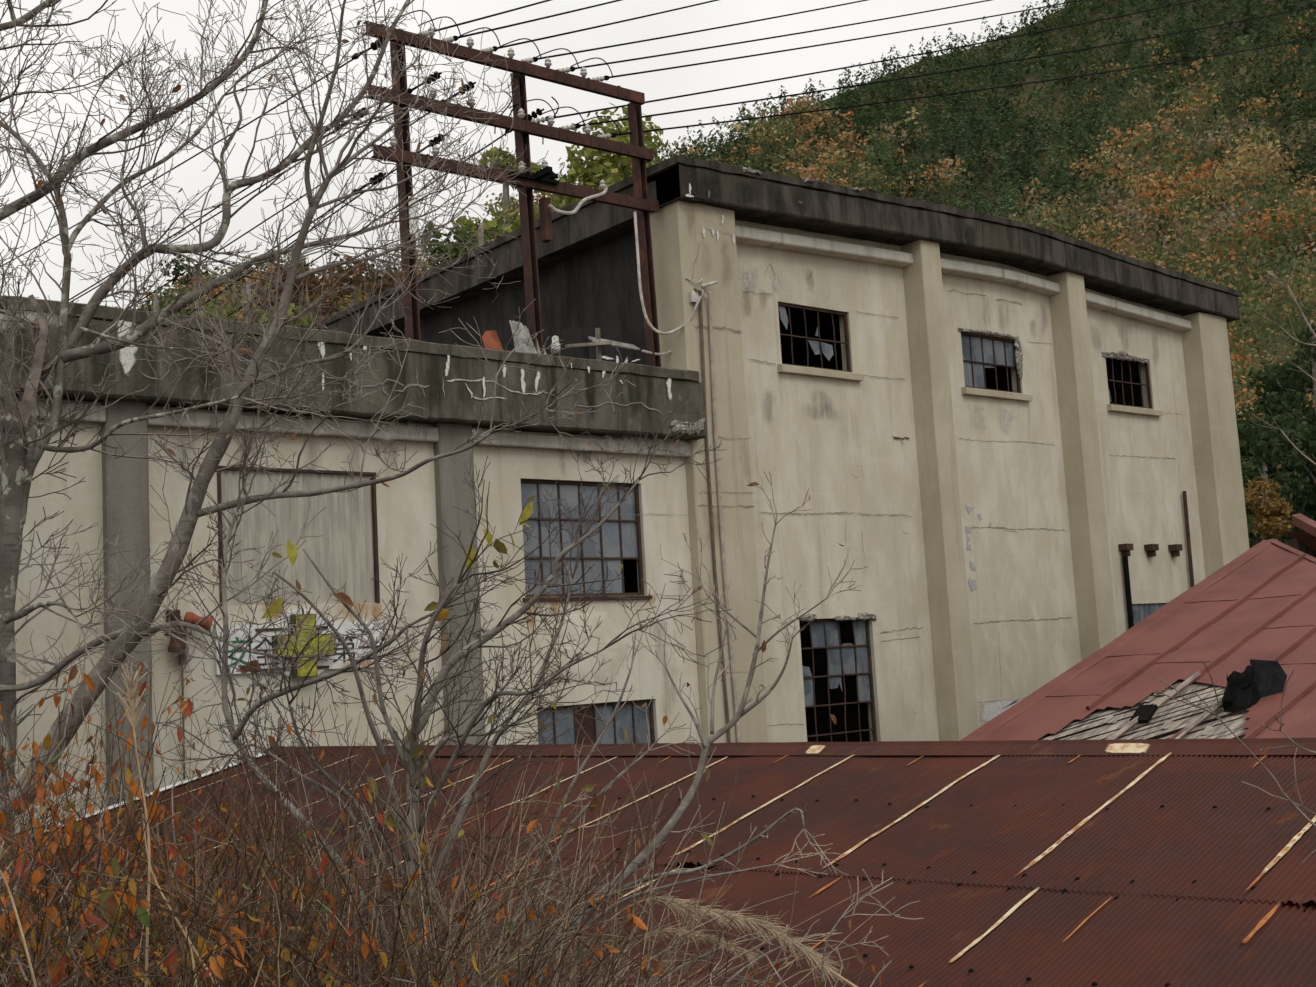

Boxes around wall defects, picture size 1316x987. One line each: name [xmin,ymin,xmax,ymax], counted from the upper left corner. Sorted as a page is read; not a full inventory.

water stain [685,178,717,198]
water stain [0,309,53,328]
water stain [88,320,138,377]
corrosion [482,330,503,350]
water stain [431,354,450,387]